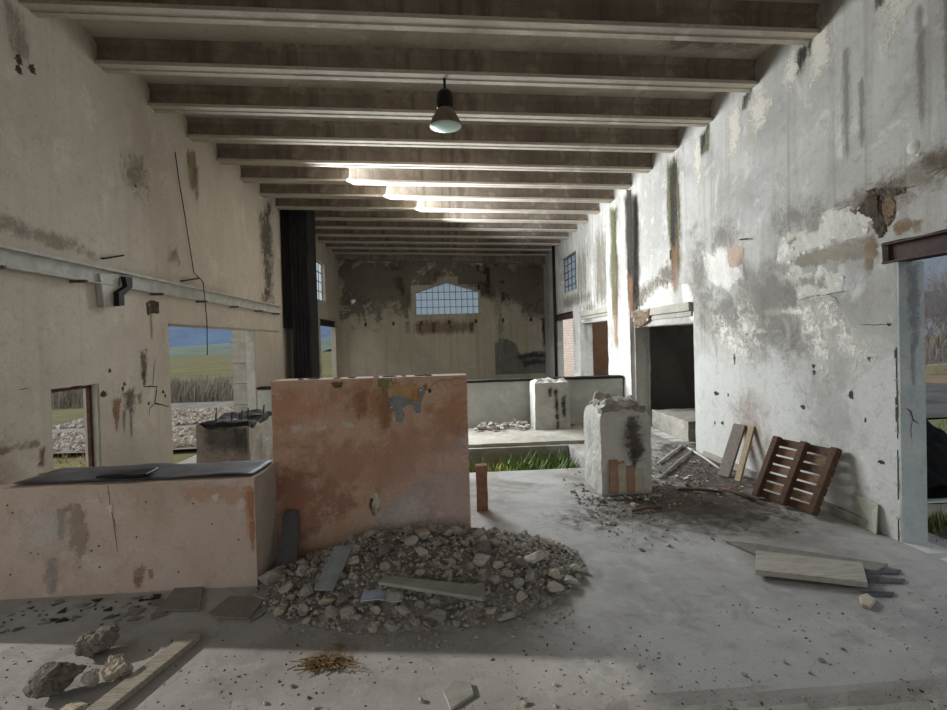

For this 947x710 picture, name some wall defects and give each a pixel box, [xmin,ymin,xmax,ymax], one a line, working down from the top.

damp [841,150,947,213]
damp [564,158,682,344]
flaking render [776,186,907,300]
rust [893,218,920,235]
damp [123,352,147,435]
peeling [389,387,432,423]
damp [565,416,803,535]
damp [58,504,88,558]